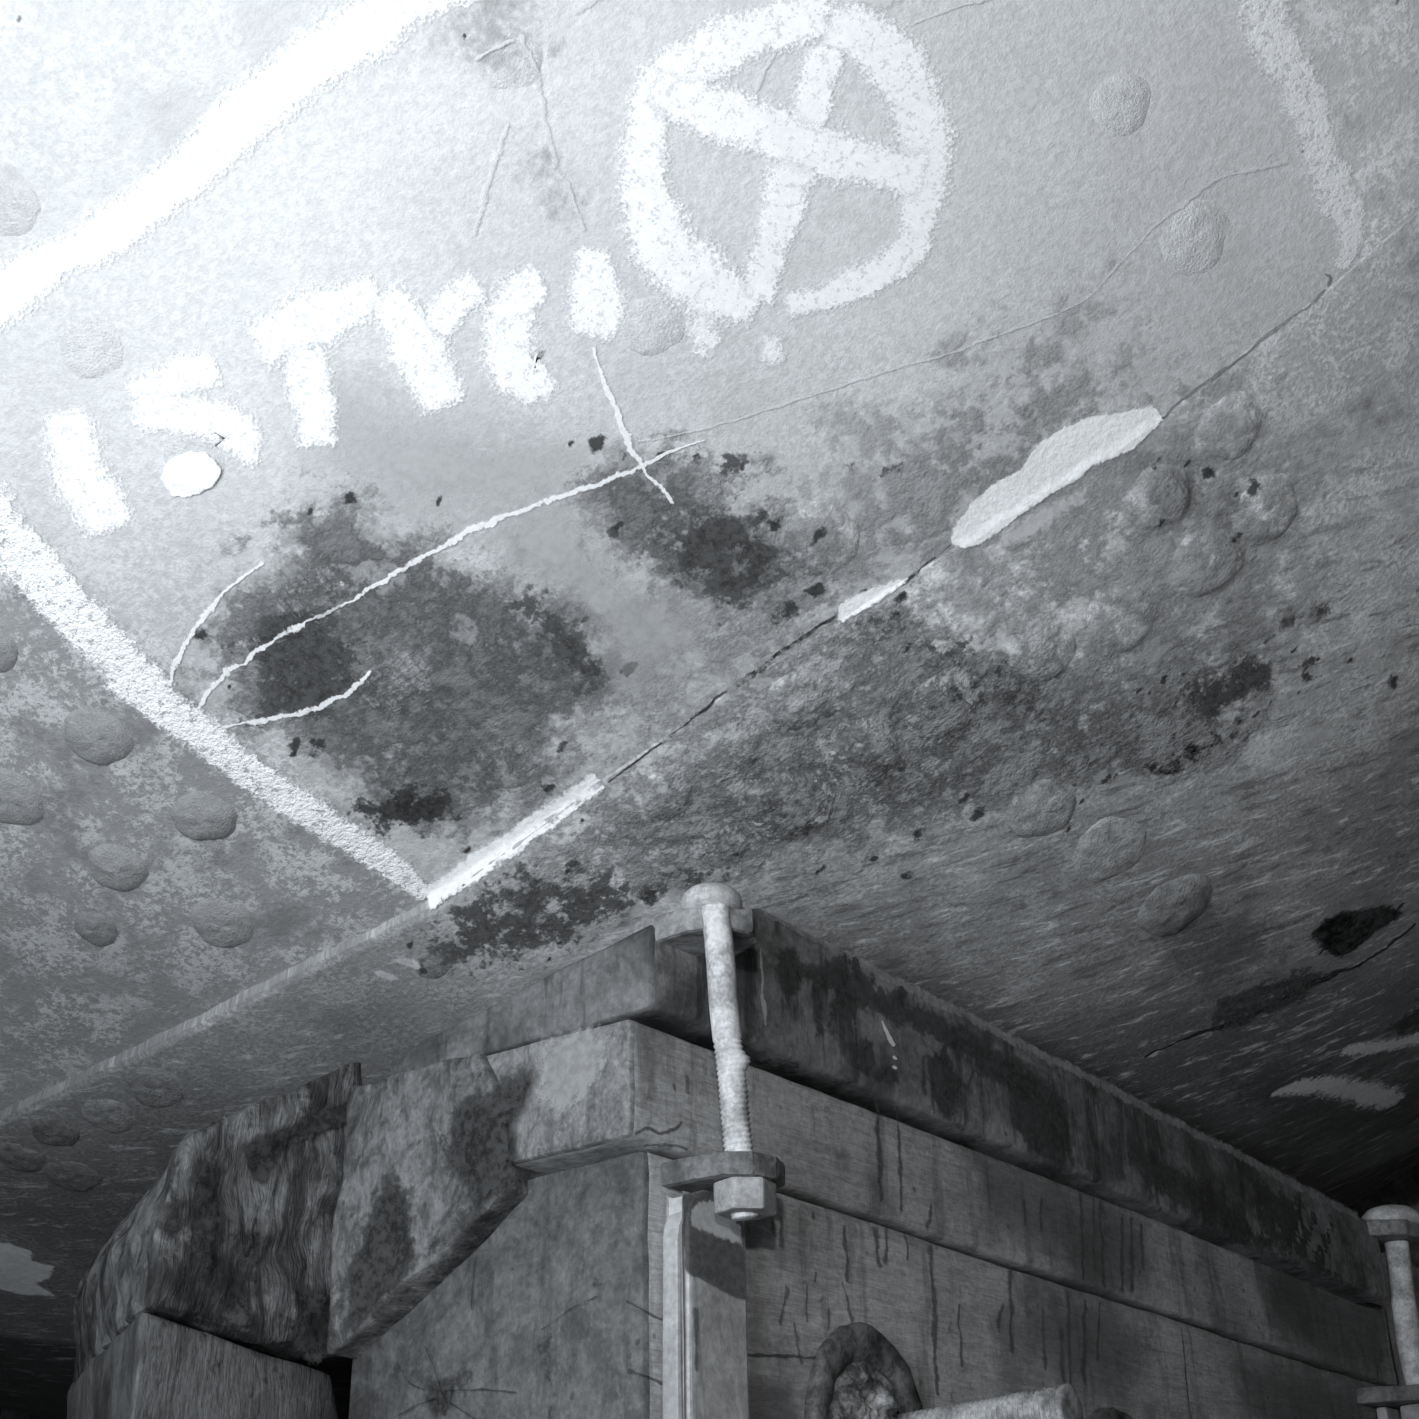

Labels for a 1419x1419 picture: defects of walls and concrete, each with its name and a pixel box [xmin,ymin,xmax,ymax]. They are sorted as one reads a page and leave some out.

water stain [1184,459,1215,479]
water stain [1234,478,1261,497]
crack [901,544,951,586]
crack [608,615,836,783]
crack [1144,923,1416,1058]
peeling [0,1243,54,1296]